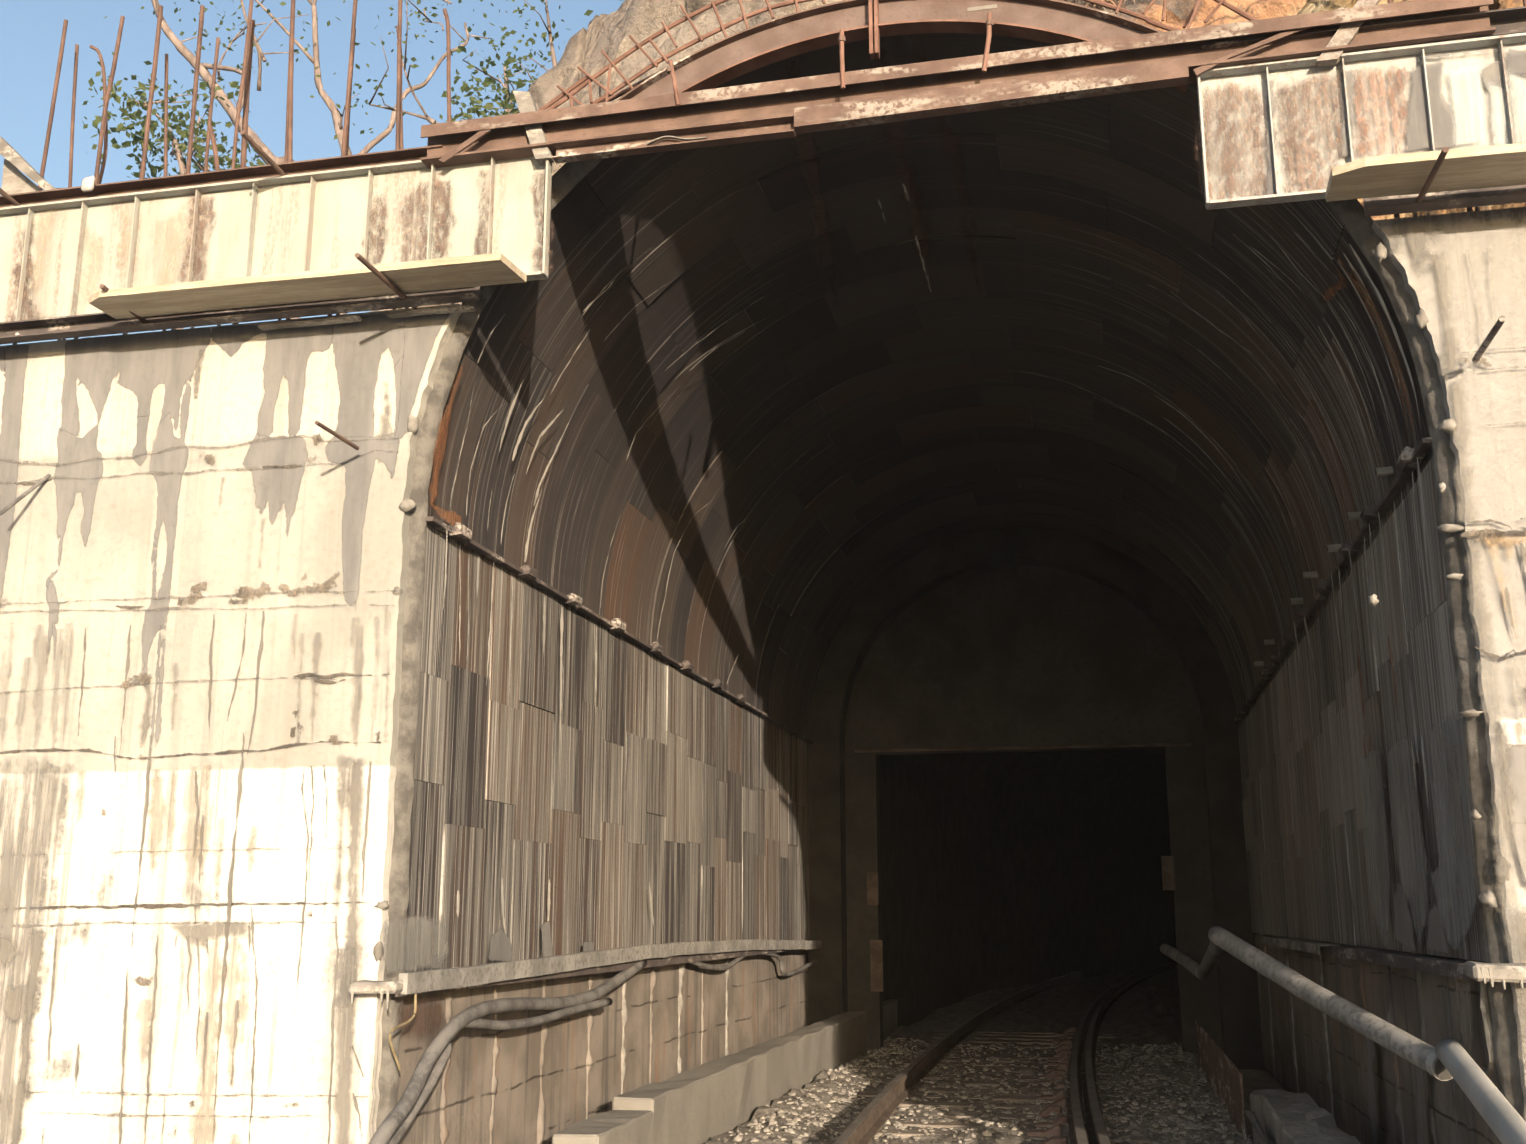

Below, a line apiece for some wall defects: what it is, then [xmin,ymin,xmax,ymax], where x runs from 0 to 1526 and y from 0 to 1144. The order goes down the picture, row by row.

rust [1198,68,1408,200]
rust [11,222,46,321]
rust [180,196,214,282]
rust [362,180,455,265]
rust [475,172,489,255]
rust [533,174,550,271]
water stain [1391,202,1526,520]
water stain [1470,540,1489,649]
crack [1475,646,1526,661]
water stain [0,314,460,1144]